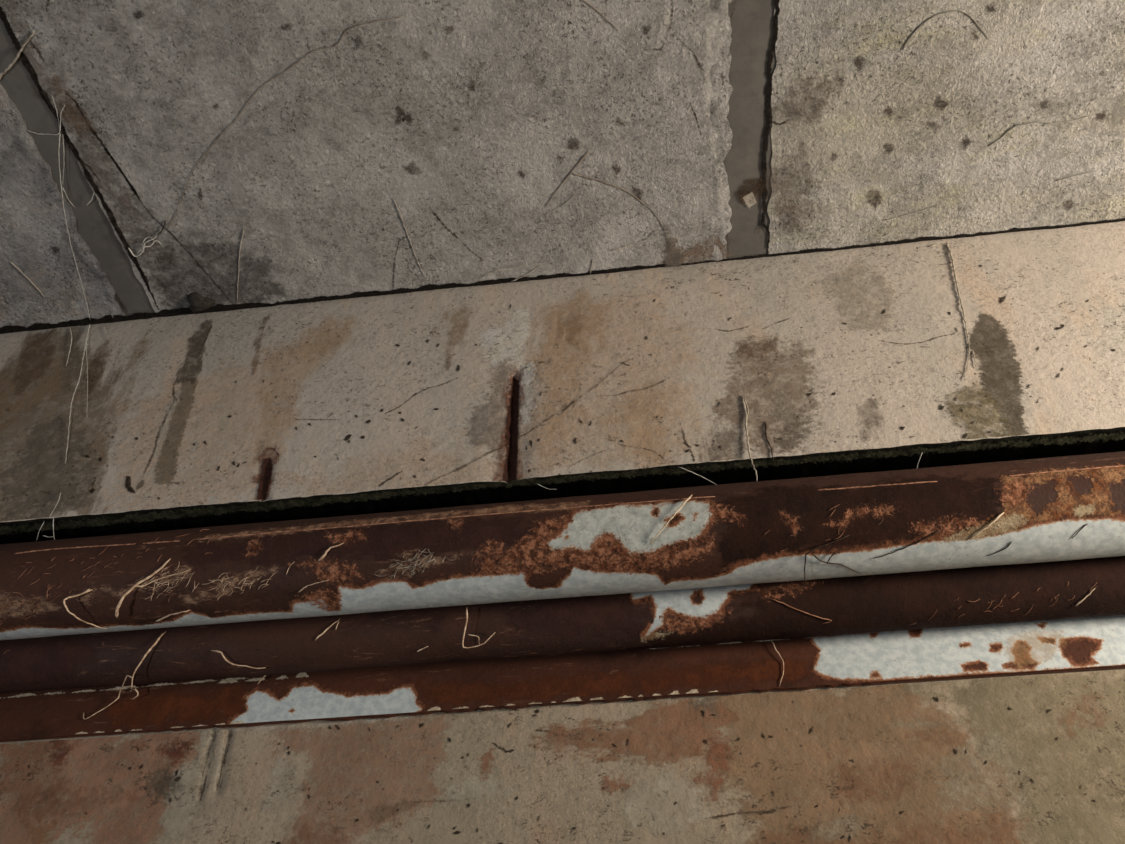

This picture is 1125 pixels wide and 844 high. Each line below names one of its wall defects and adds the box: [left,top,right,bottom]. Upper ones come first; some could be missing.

crack [0,0,1125,355]
crack [142,382,178,481]
water stain [0,306,1125,540]
peeling [0,463,1125,649]
peeling [530,697,602,717]
rust [507,597,649,637]
rust [184,475,1034,612]
peeling [619,689,718,698]
rust [620,556,1125,651]
peeling [808,615,1125,683]
water stain [903,673,1125,844]